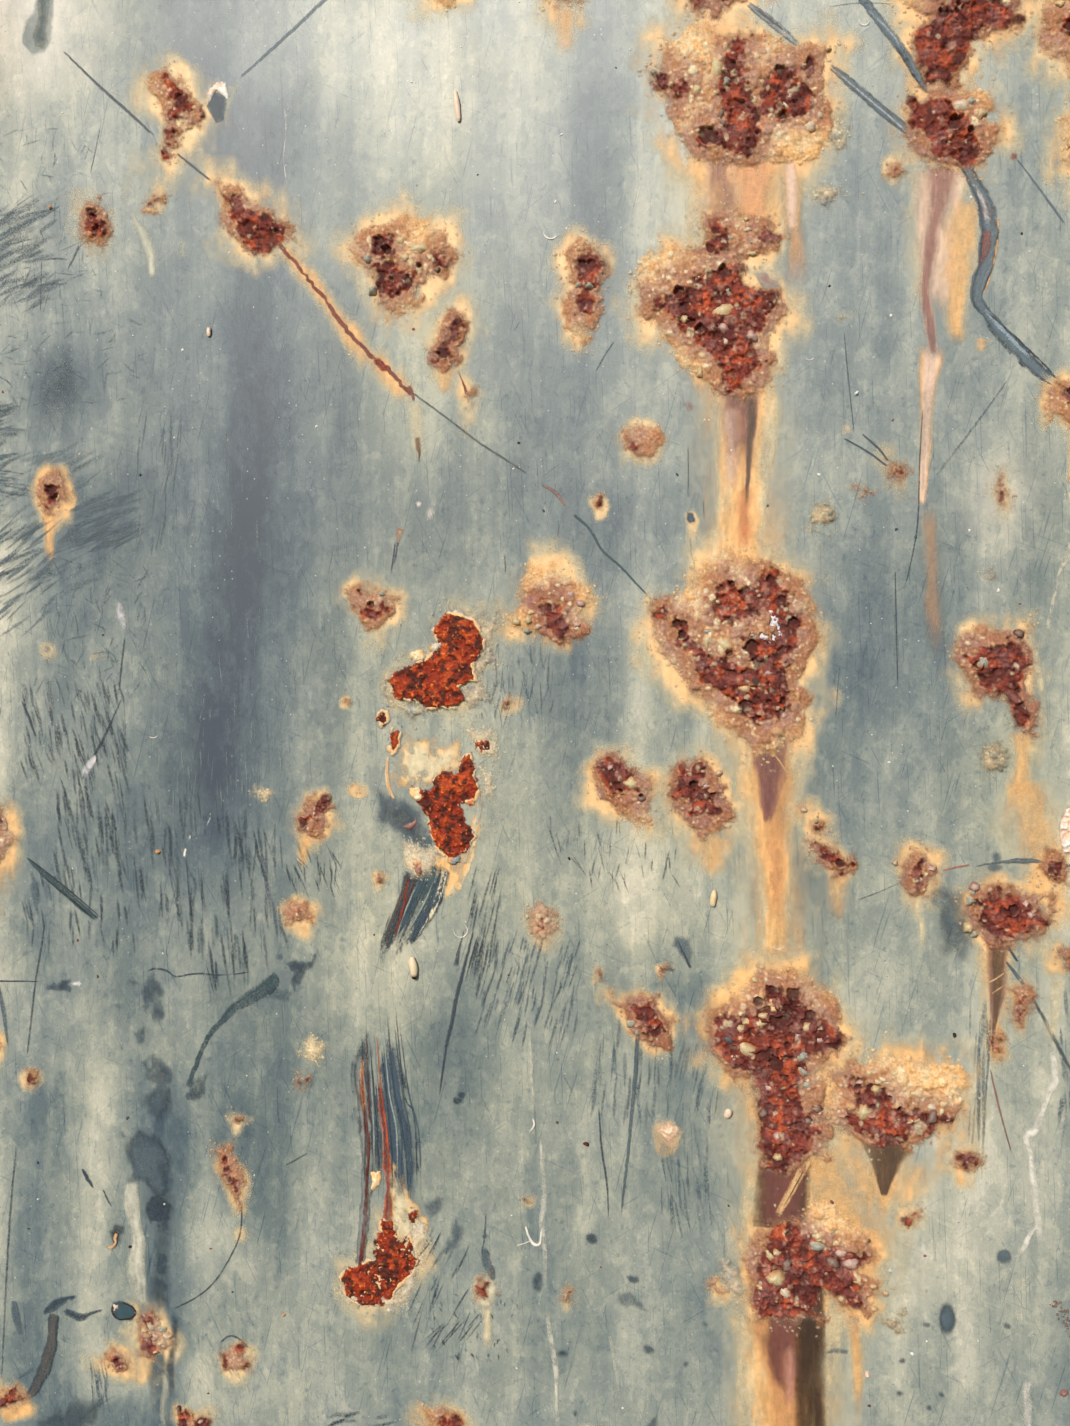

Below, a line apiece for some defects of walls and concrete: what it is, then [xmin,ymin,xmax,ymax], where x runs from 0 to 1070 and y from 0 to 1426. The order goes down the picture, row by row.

rust [335,192,479,421]
rust [553,229,614,353]
rust [881,0,1070,503]
rust [499,544,604,650]
rust [996,465,1017,510]
rust [581,0,987,1426]
rust [892,609,1070,1064]
rust [1049,1300,1070,1338]